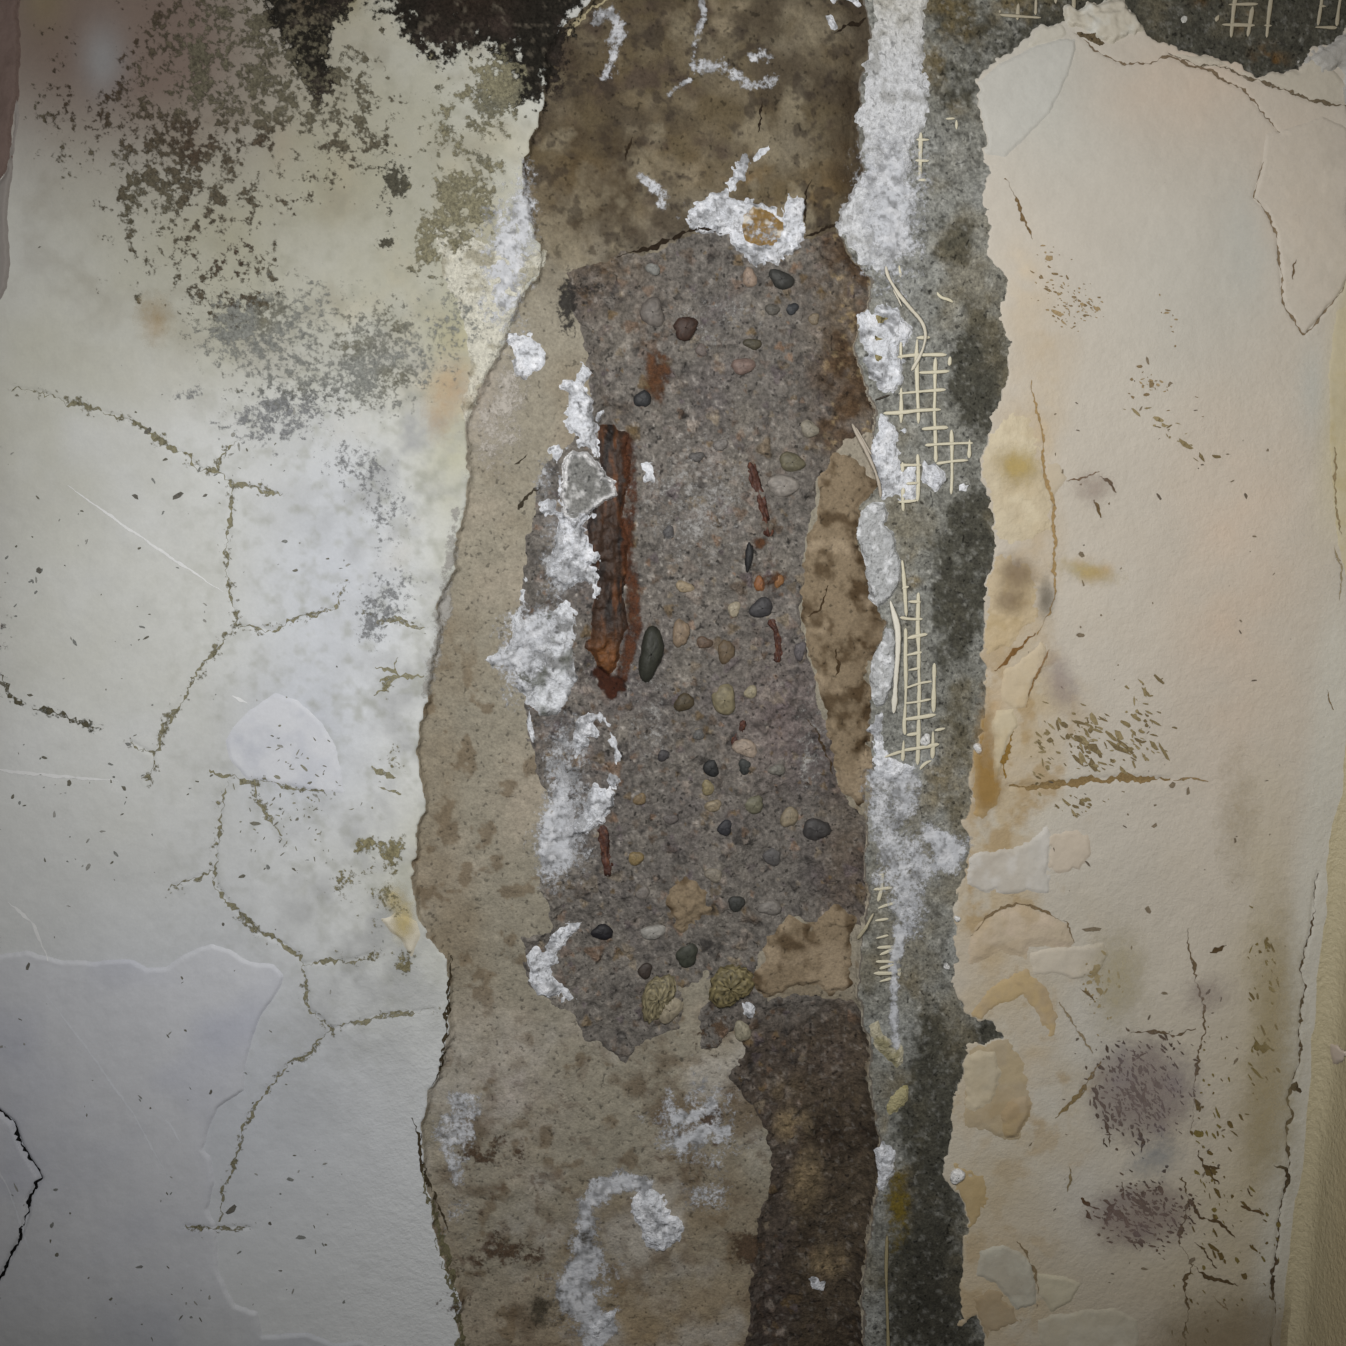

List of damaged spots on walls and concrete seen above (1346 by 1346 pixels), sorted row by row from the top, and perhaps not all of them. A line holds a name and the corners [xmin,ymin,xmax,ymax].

leakage [33,0,626,469]
crack [1,386,426,786]
efflorescence [486,362,622,893]
rust [593,435,642,700]
flaking render [381,0,1346,1346]
crack [994,380,1208,791]
crack [0,1109,43,1279]
crack [168,766,453,1233]
efflorescence [526,922,581,1003]
leakage [531,1169,685,1346]
efflorescence [861,768,969,1050]
crack [1270,874,1318,1346]